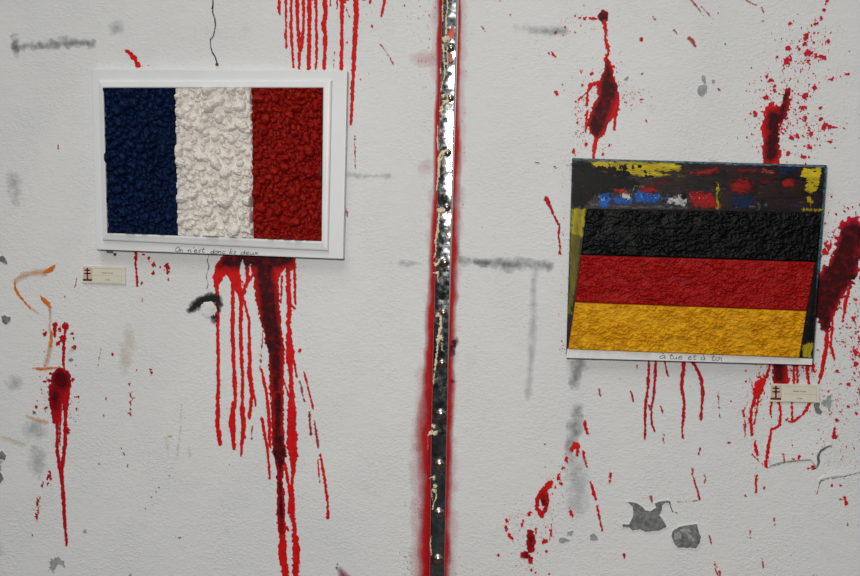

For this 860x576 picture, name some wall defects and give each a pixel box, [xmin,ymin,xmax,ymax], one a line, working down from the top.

crack [209,0,217,63]
peeling [0,449,8,485]
spalling [620,498,704,552]